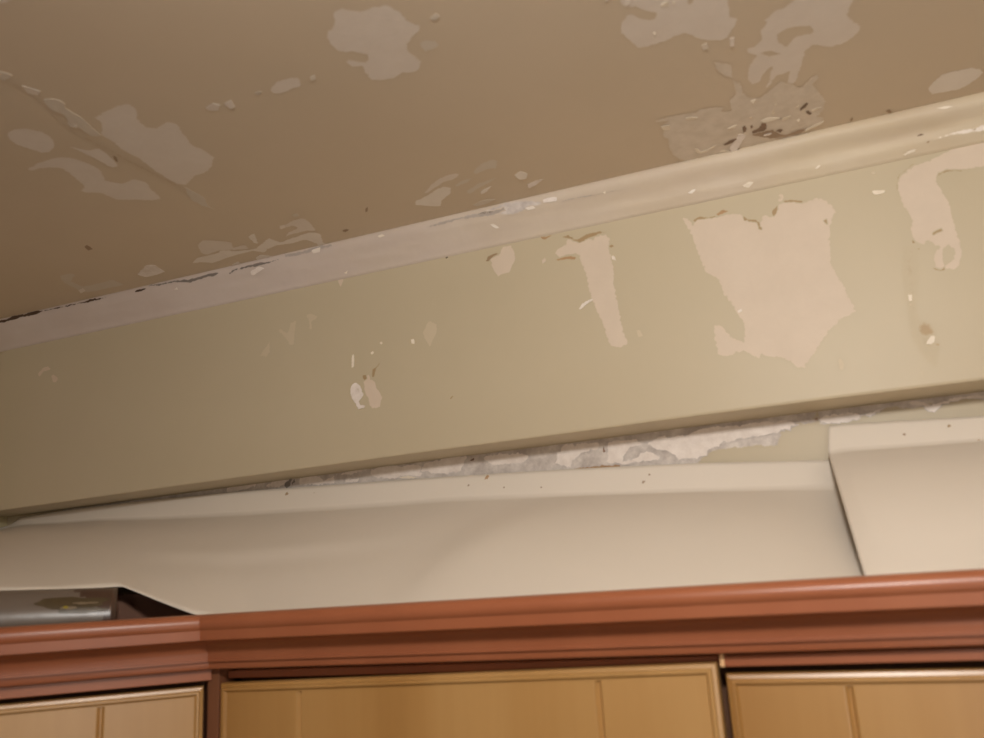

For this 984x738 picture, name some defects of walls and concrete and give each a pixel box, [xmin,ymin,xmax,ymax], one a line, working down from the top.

peeling [326,4,440,81]
flaking render [605,0,861,163]
peeling [928,67,984,95]
crack [0,297,106,323]
peeling [6,103,215,201]
crack [135,243,332,292]
peeling [191,214,328,265]
peeling [486,245,515,277]
peeling [541,230,629,348]
peeling [681,193,856,368]
peeling [872,124,984,271]
flaking render [61,392,984,511]